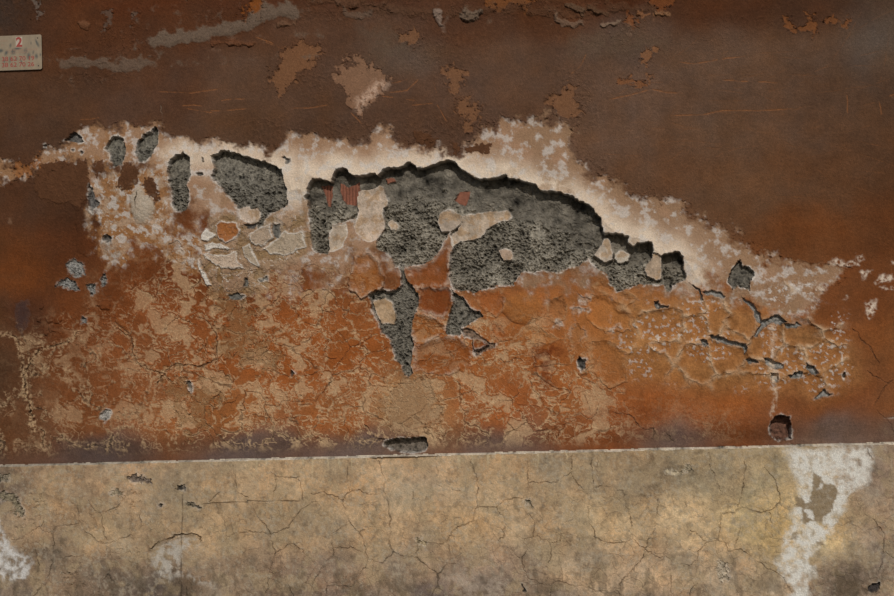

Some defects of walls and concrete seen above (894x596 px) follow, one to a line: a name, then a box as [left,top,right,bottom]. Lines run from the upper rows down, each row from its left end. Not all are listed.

peeling [268,40,323,98]
peeling [331,54,391,115]
peeling [13,83,844,357]
water stain [828,256,894,290]
spalling [369,260,419,377]
water stain [865,299,878,316]
crack [151,327,620,596]
spalling [385,436,429,454]
spalling [769,415,792,441]
crack [685,460,792,593]
water stain [766,444,892,596]
crack [873,519,894,571]